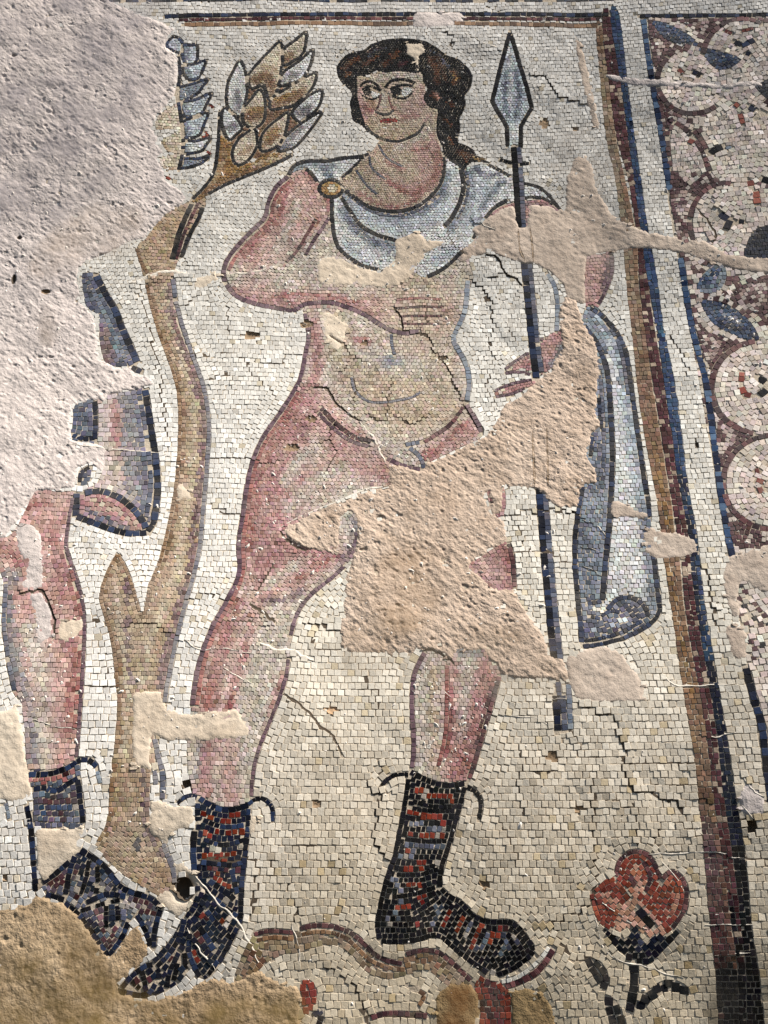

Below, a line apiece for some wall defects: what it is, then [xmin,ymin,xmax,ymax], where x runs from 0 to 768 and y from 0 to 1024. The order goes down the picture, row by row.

spalling [0,0,186,643]
crack [394,219,522,432]
crack [71,261,428,684]
spalling [283,155,768,703]
spalling [0,704,33,804]
crack [88,666,113,690]
spalling [129,691,249,770]
spalling [0,895,302,1024]
spalling [154,862,206,917]
crack [187,928,215,969]
crack [195,844,424,1024]
spalling [508,988,555,1024]